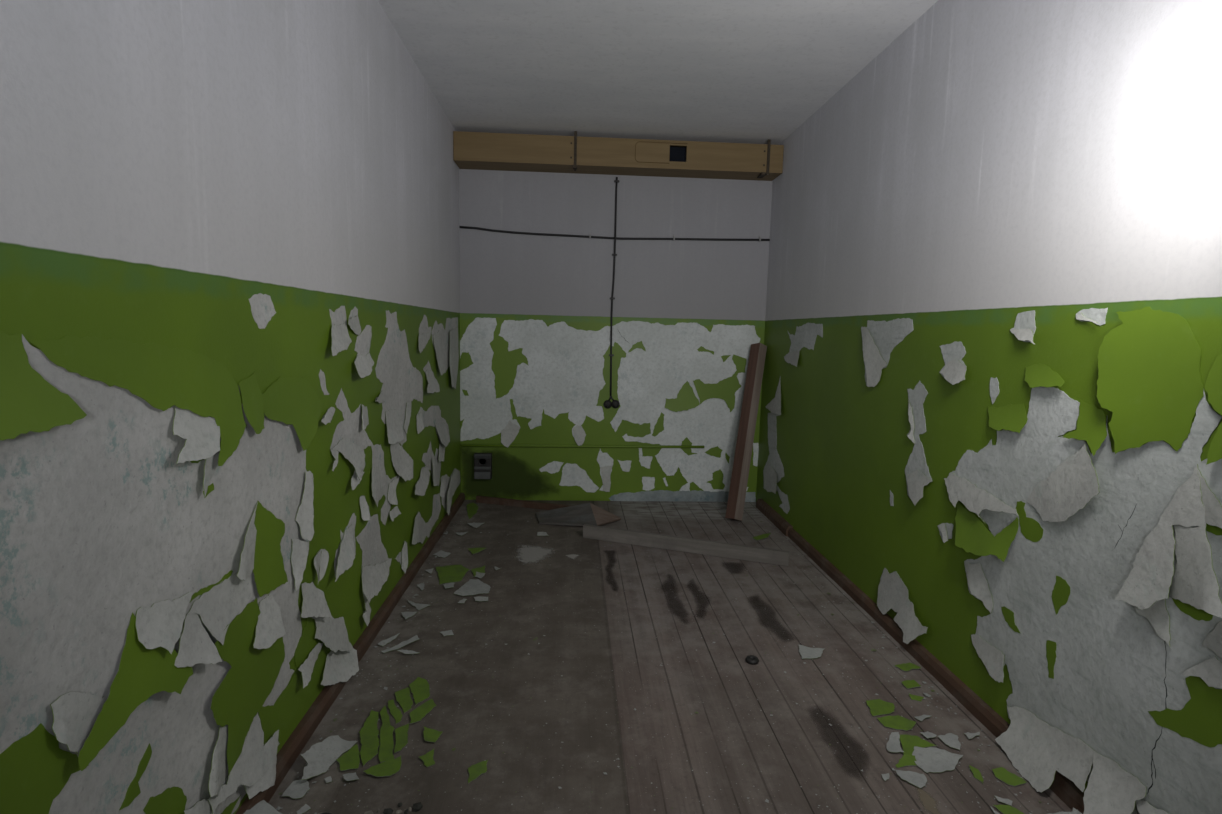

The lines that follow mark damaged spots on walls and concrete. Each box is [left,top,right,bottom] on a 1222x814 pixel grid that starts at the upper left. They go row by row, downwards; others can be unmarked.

peeling [249,293,276,329]
peeling [784,323,823,367]
peeling [861,318,913,387]
peeling [745,380,790,514]
peeling [0,306,760,814]
peeling [890,306,1222,814]
peeling [877,568,928,644]